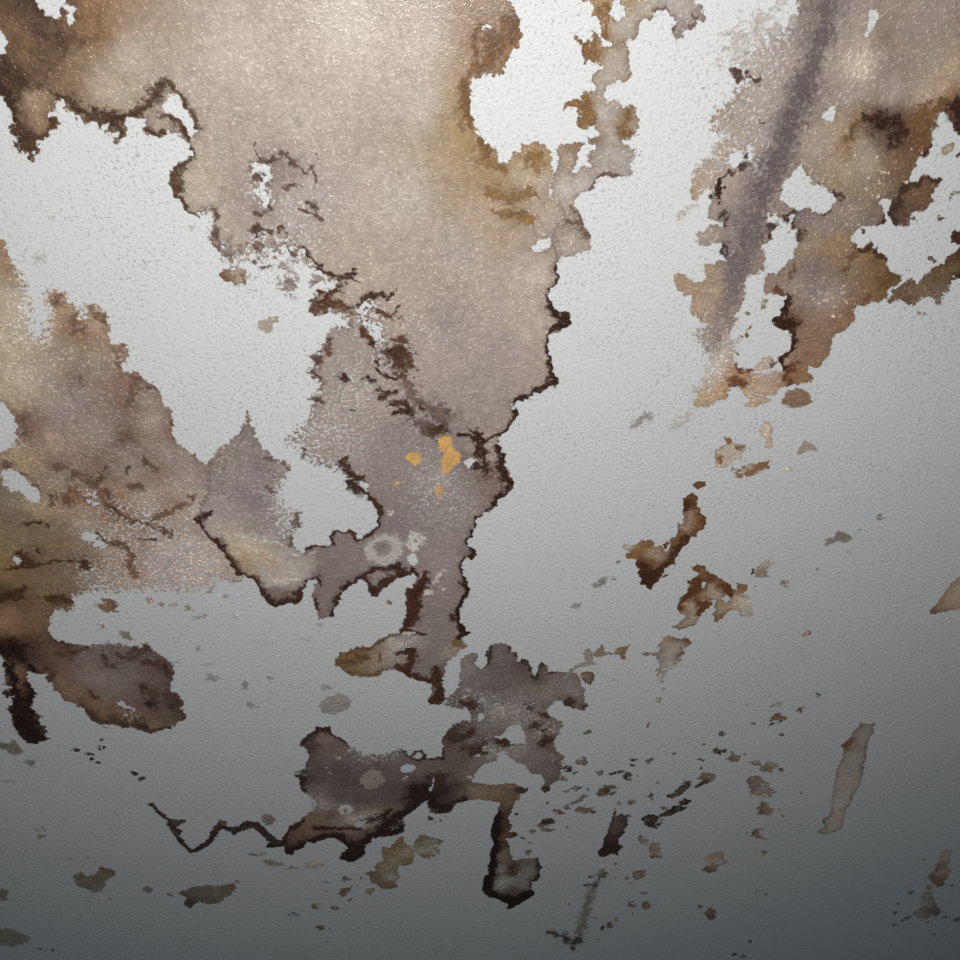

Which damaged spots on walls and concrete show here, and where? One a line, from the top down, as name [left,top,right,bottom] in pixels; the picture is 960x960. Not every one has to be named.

water stain [674,0,960,408]
water stain [0,0,706,910]
water stain [546,869,608,950]